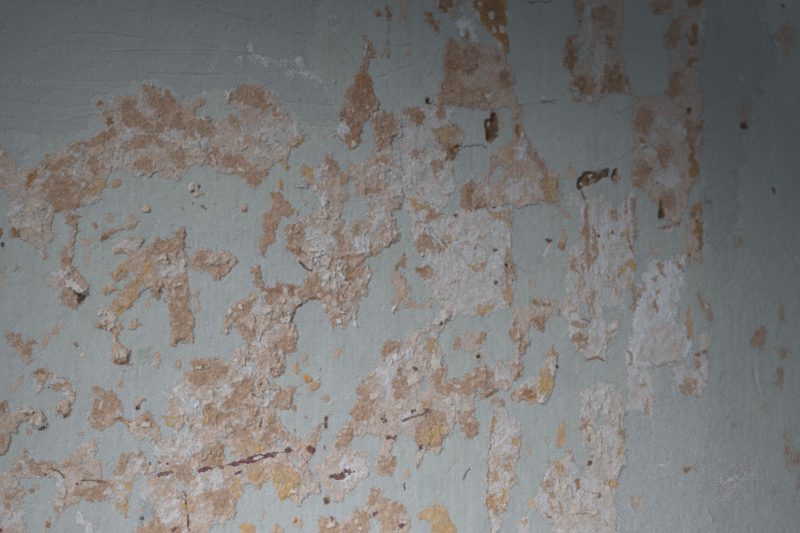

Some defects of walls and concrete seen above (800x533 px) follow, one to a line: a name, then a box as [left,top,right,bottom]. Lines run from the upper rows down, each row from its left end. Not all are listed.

peeling [0,34,403,533]
peeling [316,484,457,533]
peeling [483,396,523,533]
peeling [314,0,712,505]